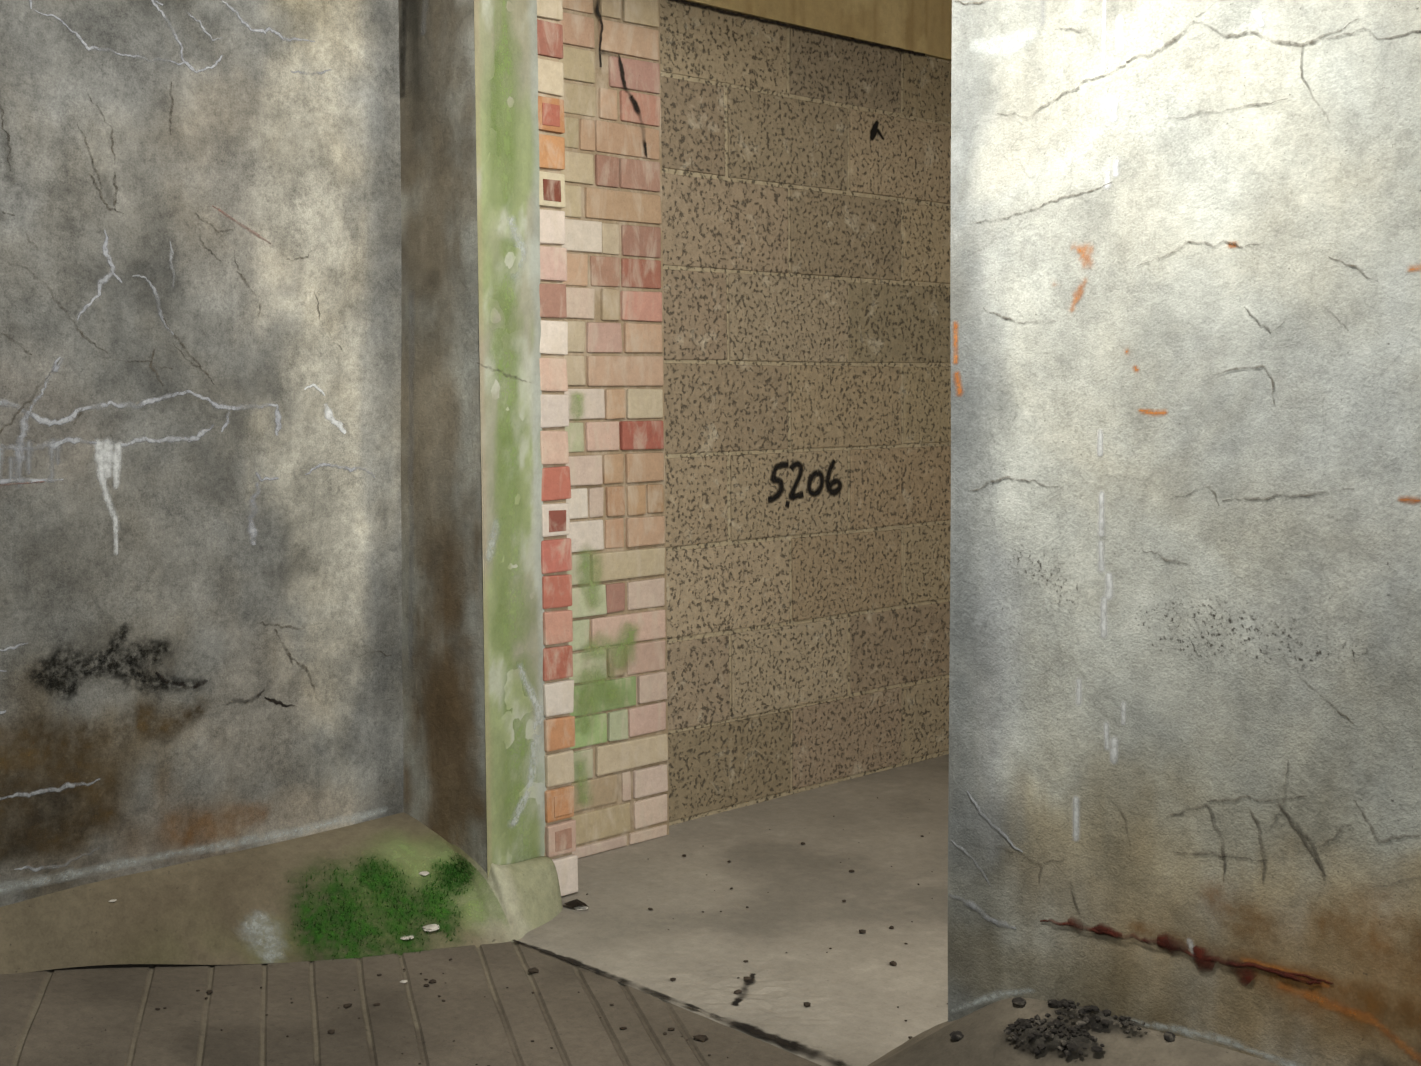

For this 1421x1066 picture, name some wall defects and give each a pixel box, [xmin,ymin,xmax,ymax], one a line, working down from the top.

crack [29,0,331,134]
crack [595,0,647,158]
crack [670,0,925,57]
crack [1227,19,1356,106]
crack [0,98,281,484]
leakage [0,724,114,855]
leakage [1136,1020,1294,1066]
corrosion [1040,919,1414,1055]